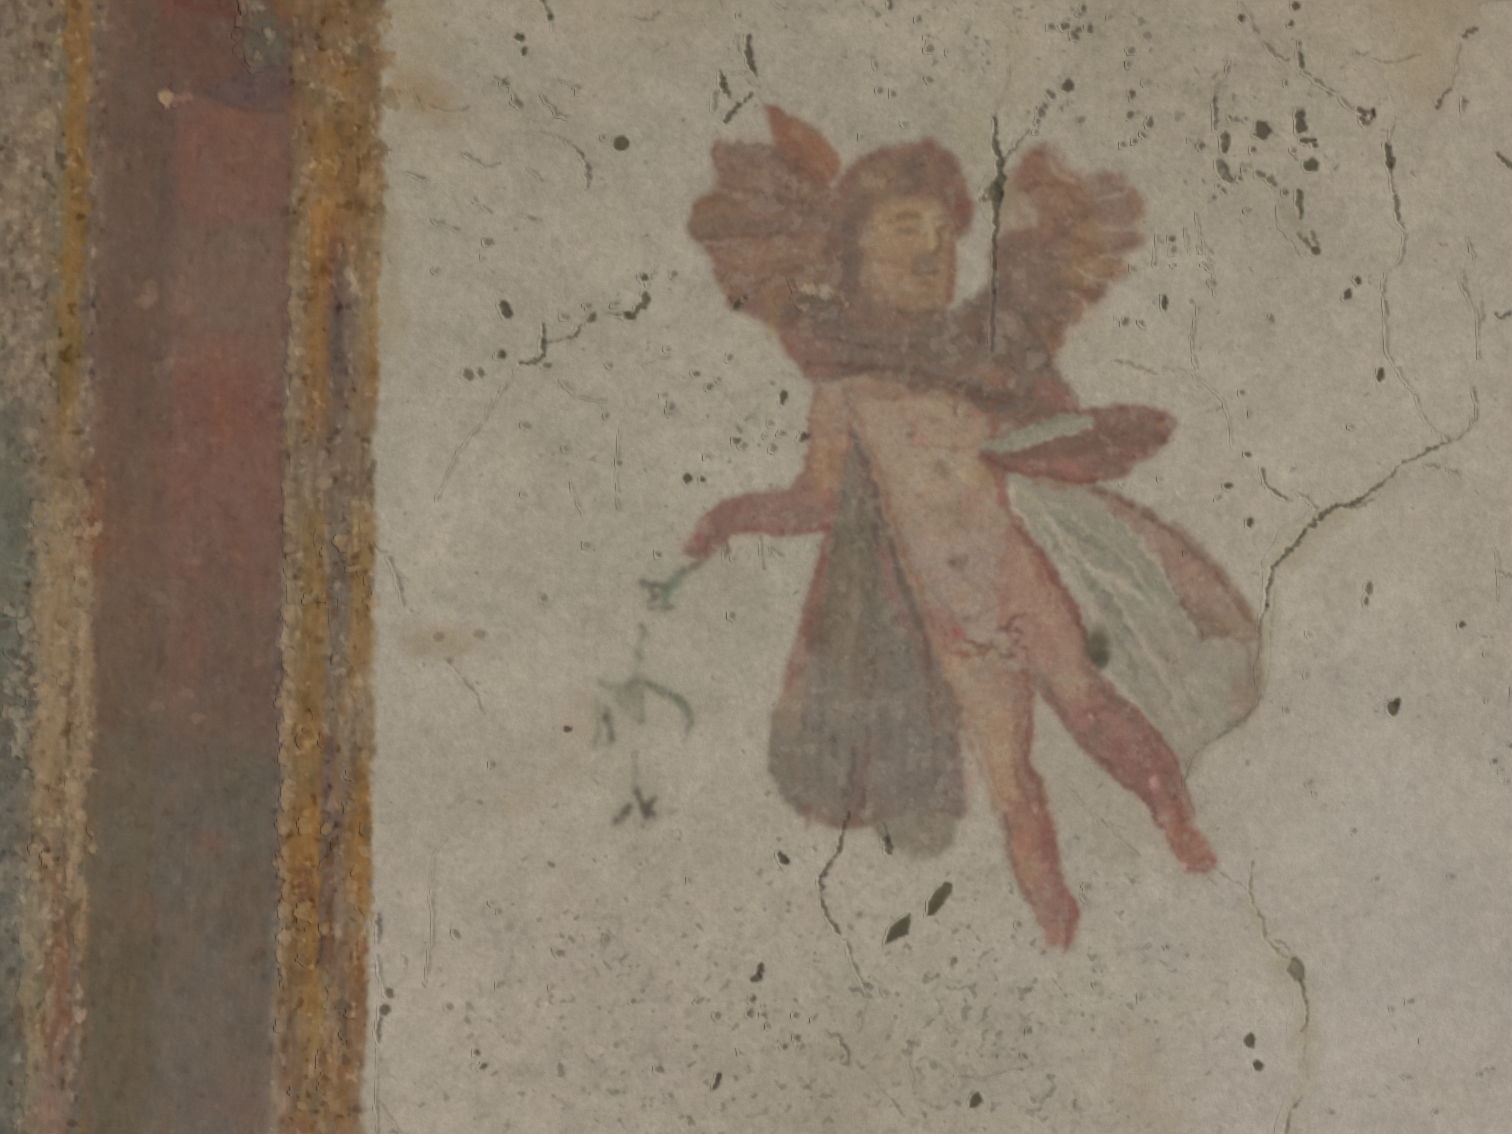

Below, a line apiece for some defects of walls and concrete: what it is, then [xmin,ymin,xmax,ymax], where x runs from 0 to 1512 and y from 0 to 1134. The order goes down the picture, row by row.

crack [976,42,1030,354]
spalling [1250,119,1274,141]
spalling [1254,169,1290,197]
spalling [1292,106,1321,174]
crack [435,264,660,517]
crack [1107,0,1512,790]
spalling [882,880,953,948]
crack [816,810,1035,1111]
crack [1211,859,1326,1134]